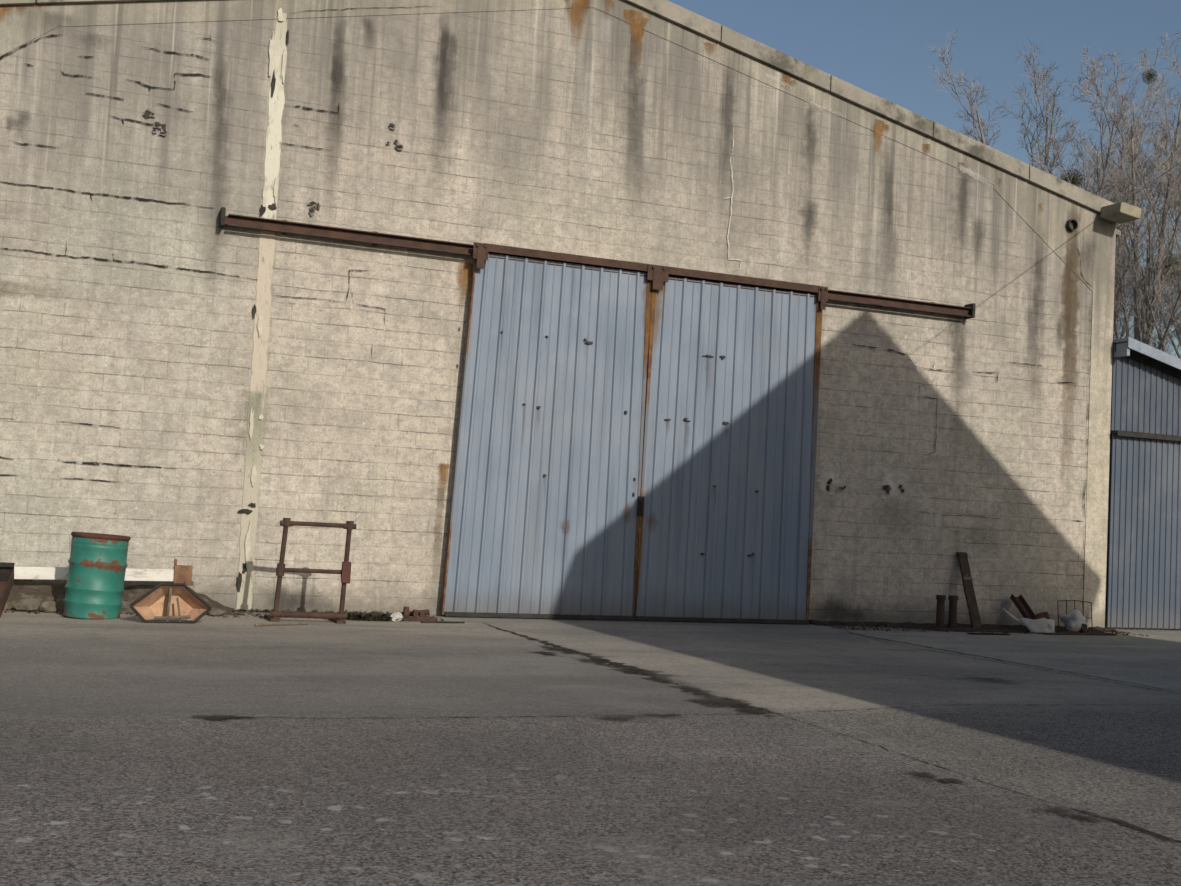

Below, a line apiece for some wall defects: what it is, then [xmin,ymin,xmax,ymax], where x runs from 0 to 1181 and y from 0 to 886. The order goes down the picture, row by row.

crack [0,34,217,125]
peeling [269,8,289,97]
damp [441,33,454,99]
rust [569,0,588,27]
rust [625,10,647,53]
rust [874,120,889,145]
peeling [260,176,279,216]
peeling [252,304,263,337]
rust [646,285,655,324]
damp [1059,249,1079,386]